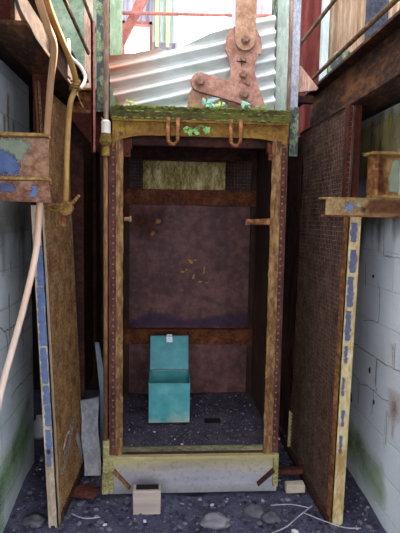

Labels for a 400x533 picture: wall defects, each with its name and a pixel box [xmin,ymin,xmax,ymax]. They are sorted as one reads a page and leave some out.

peeling [0,137,31,175]
peeling [0,182,16,193]
mould [347,431,359,451]